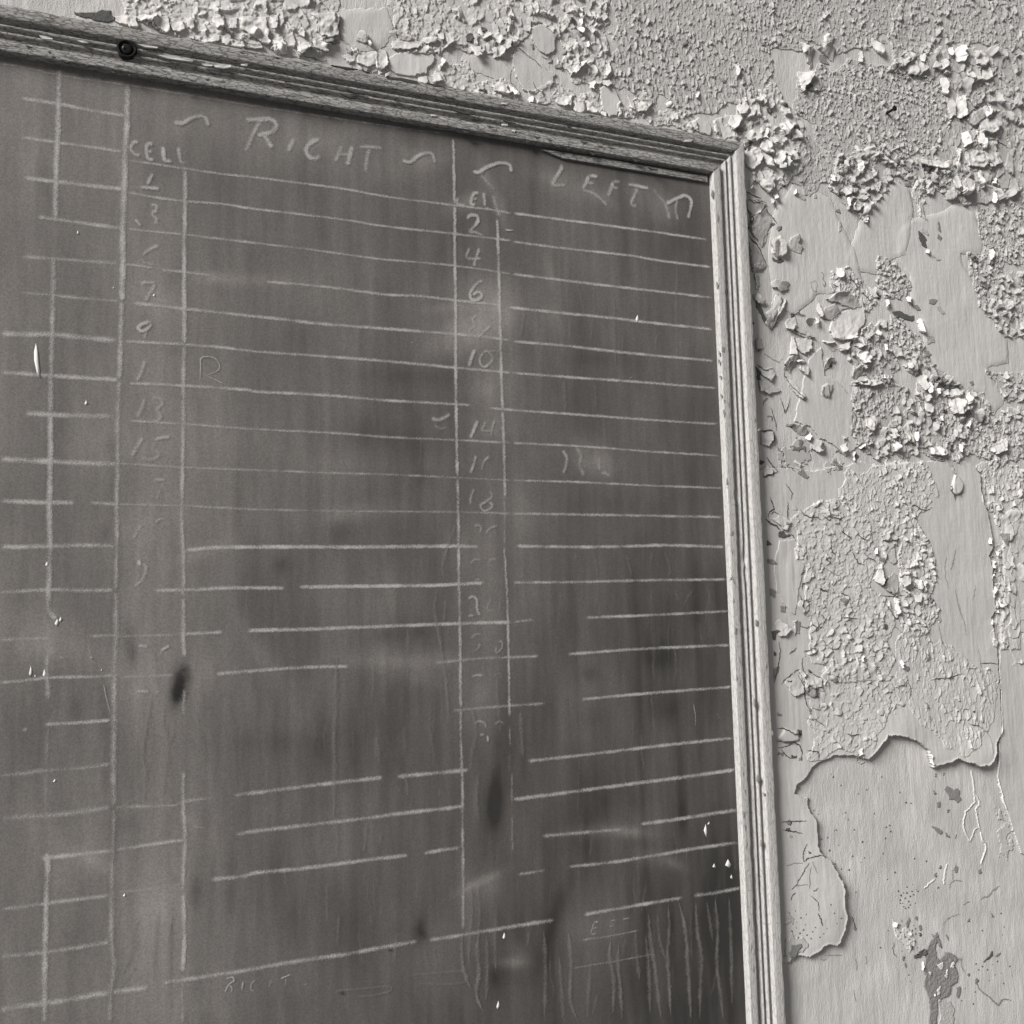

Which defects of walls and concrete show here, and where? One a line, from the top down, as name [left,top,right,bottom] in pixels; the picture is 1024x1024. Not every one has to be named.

peeling [136,44,248,69]
peeling [115,0,340,63]
flaking render [342,0,1024,964]
spalling [887,884,976,1024]